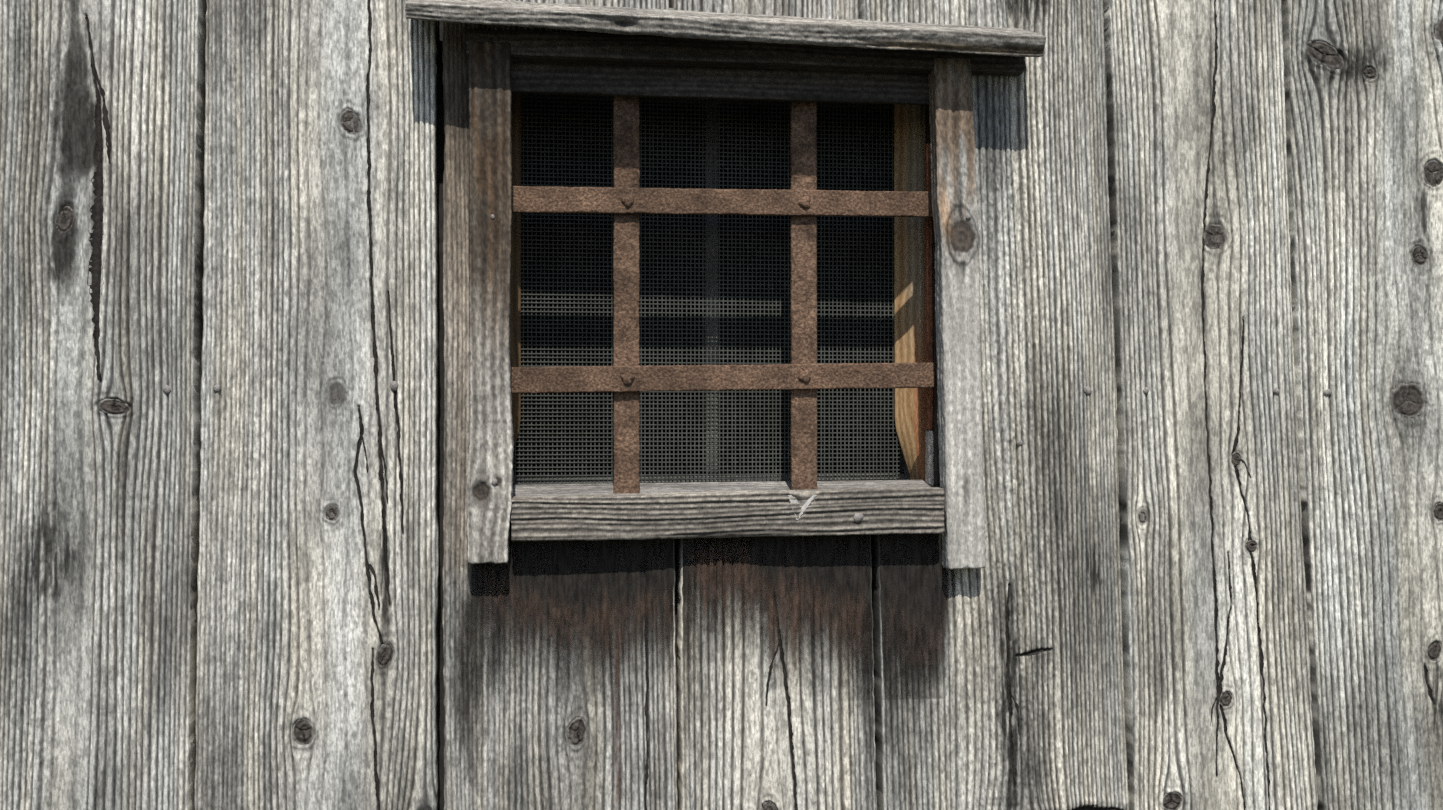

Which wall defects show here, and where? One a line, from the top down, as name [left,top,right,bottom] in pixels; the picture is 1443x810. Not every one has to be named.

crack [354,0,404,810]
crack [1073,802,1121,810]